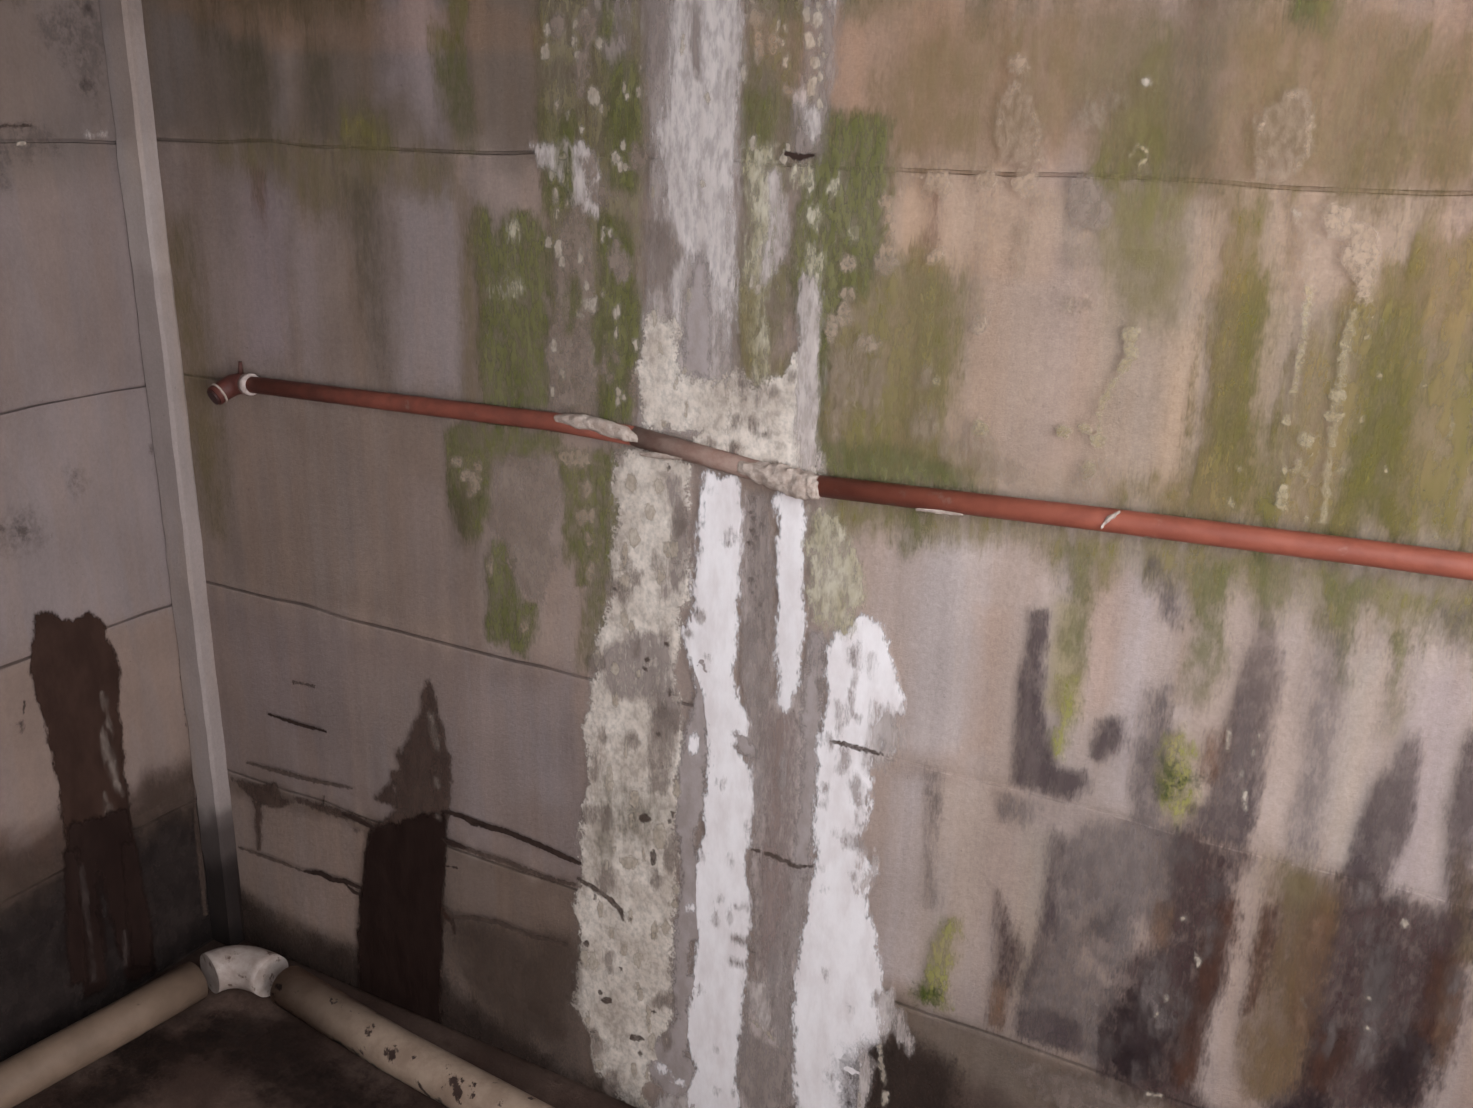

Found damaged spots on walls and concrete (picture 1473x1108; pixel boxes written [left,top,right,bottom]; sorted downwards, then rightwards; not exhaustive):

leakage [593,0,827,475]
leakage [1195,199,1270,516]
leakage [0,611,212,1062]
crack [268,680,327,733]
crack [239,847,362,895]
crack [246,762,376,830]
crack [443,906,568,945]
crack [440,810,581,886]
leakage [231,448,952,1108]
peeling [892,1010,914,1054]
leakage [989,610,1277,1108]
leakage [1276,738,1473,1108]